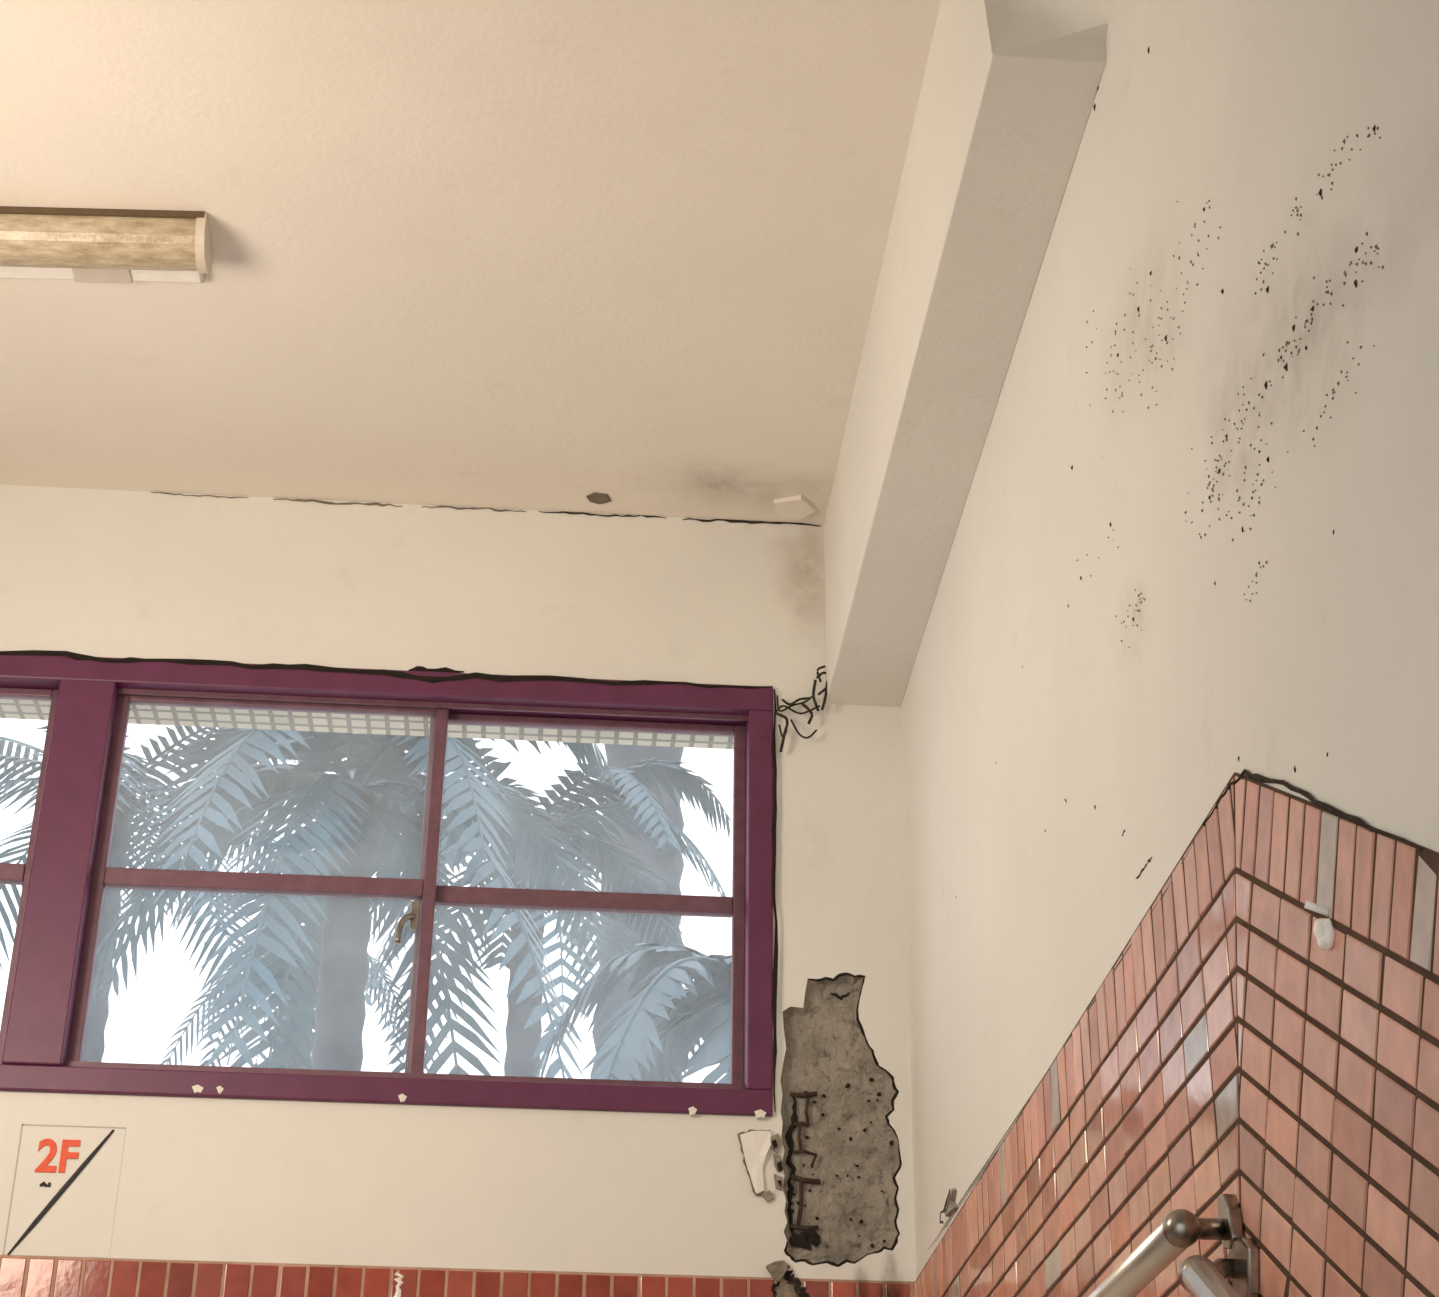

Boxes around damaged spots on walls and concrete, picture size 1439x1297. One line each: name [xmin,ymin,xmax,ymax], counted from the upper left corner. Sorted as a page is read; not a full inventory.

water stain [1089,199,1221,413]
water stain [1254,197,1302,295]
water stain [1184,232,1384,541]
water stain [1316,125,1381,200]
peeling [192,1084,224,1094]
spalling [737,973,902,1297]